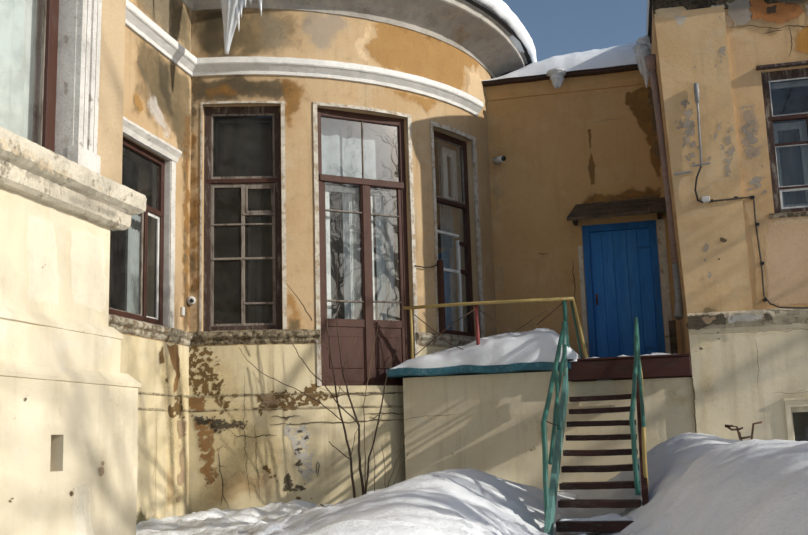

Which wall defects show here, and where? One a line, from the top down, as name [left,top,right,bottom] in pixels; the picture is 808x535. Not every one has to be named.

flaking render [712,0,808,27]
crack [733,25,808,56]
water stain [355,22,486,103]
water stain [134,39,304,157]
water stain [395,90,436,112]
water stain [625,87,661,177]
water stain [583,188,660,204]
spalling [686,308,772,339]
flaking render [257,381,339,416]
flaking render [159,344,248,491]
flaking render [262,422,318,500]